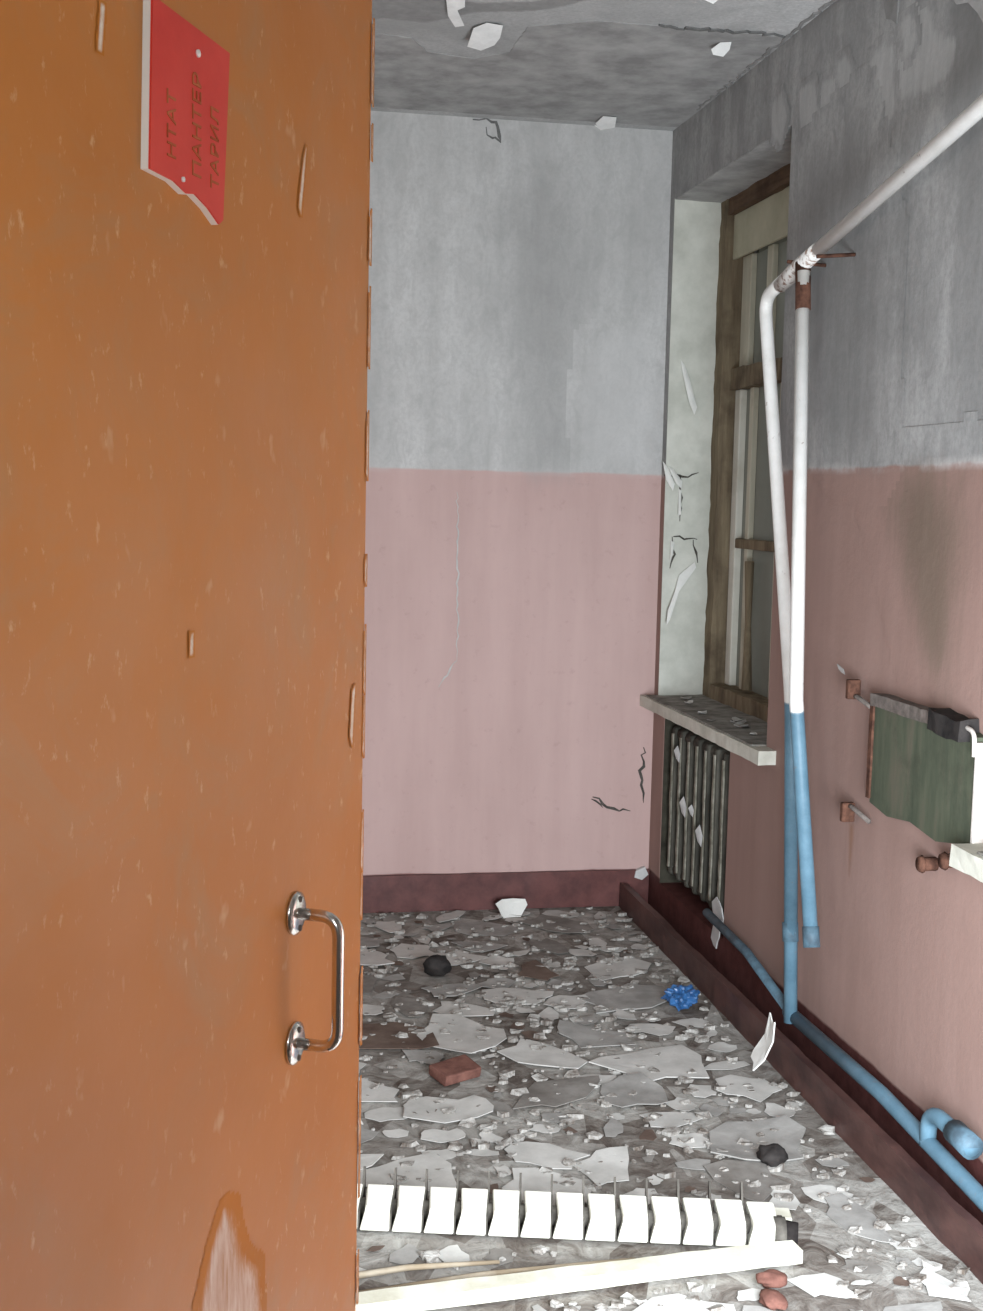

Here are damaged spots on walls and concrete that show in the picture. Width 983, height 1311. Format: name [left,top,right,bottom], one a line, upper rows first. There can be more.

peeling [954,0,983,22]
flaking render [371,0,790,162]
peeling [769,0,963,153]
crack [664,472,699,567]
crack [592,747,646,812]